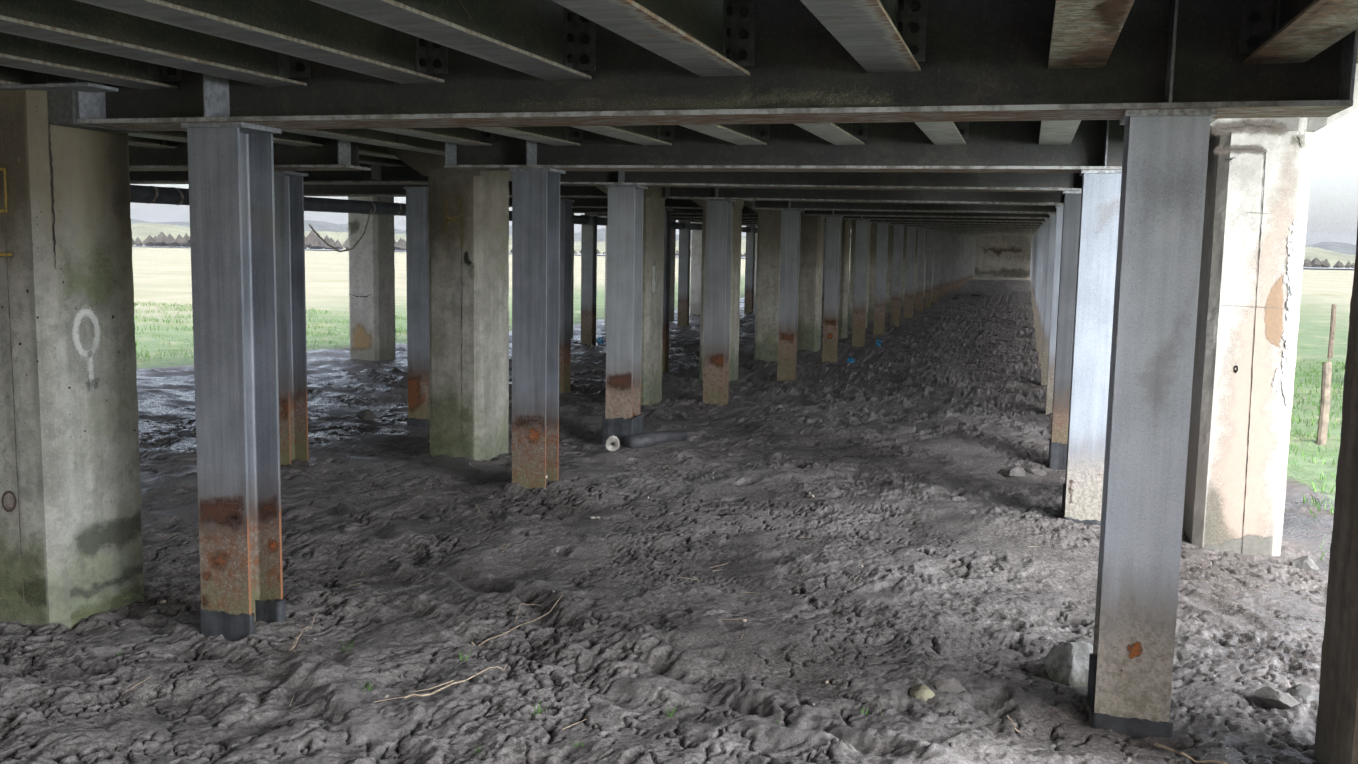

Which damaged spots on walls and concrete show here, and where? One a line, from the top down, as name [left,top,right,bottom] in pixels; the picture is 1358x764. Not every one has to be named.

rust [607,373,631,390]
rust [200,497,244,531]
rust [261,497,277,520]
water stain [77,513,141,556]
water stain [70,567,144,619]
rust [1121,642,1143,672]